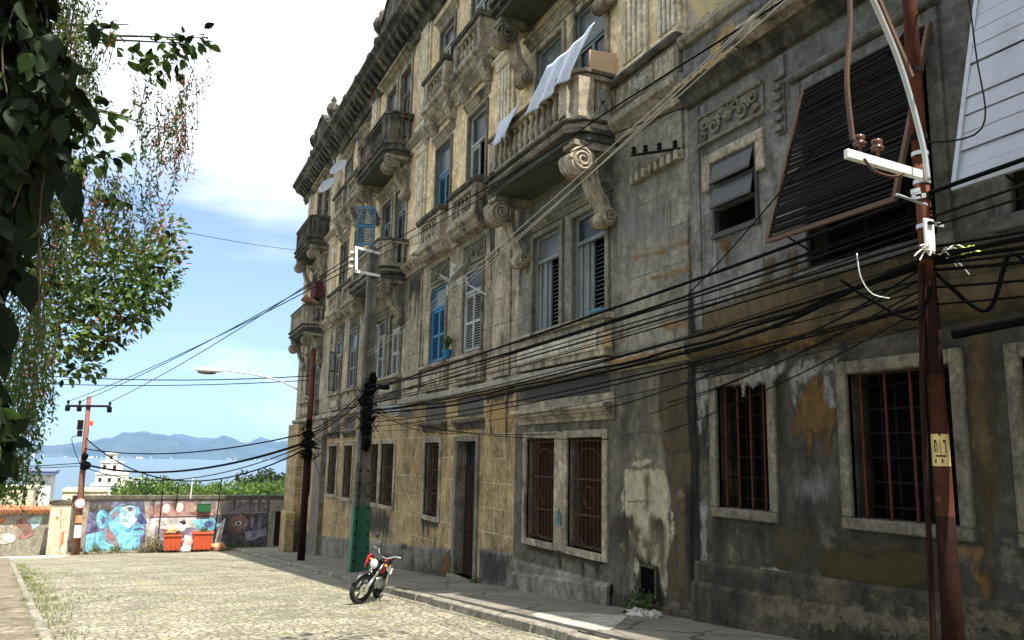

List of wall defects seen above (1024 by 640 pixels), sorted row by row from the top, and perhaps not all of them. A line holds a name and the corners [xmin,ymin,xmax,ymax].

peeling [695,373,712,446]
water stain [635,218,919,610]
flaking render [620,459,686,596]